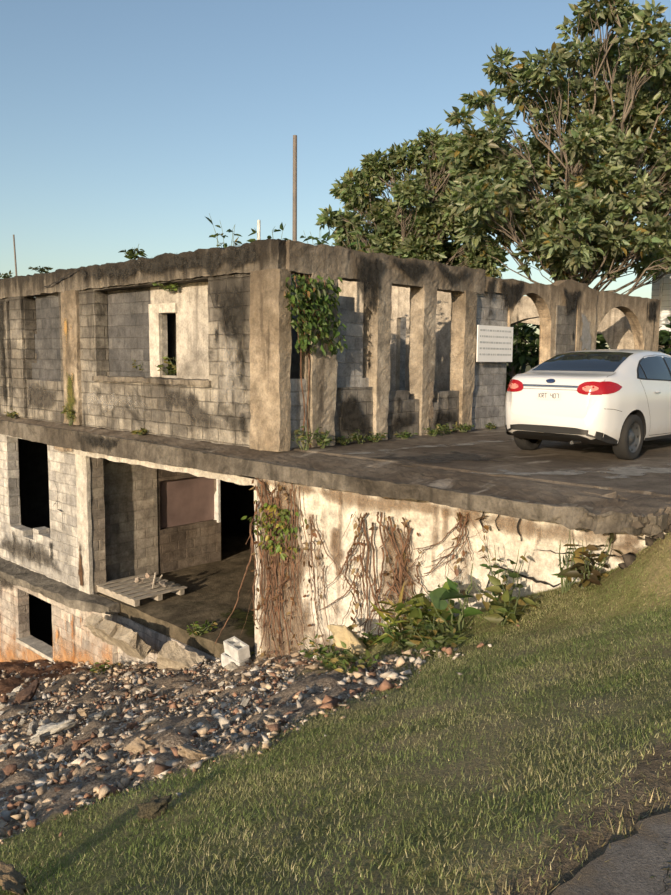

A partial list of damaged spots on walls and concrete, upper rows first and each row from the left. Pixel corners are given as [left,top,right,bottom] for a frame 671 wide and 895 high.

damp [80,245,257,281]
damp [215,286,246,388]
spalling [611,514,671,569]